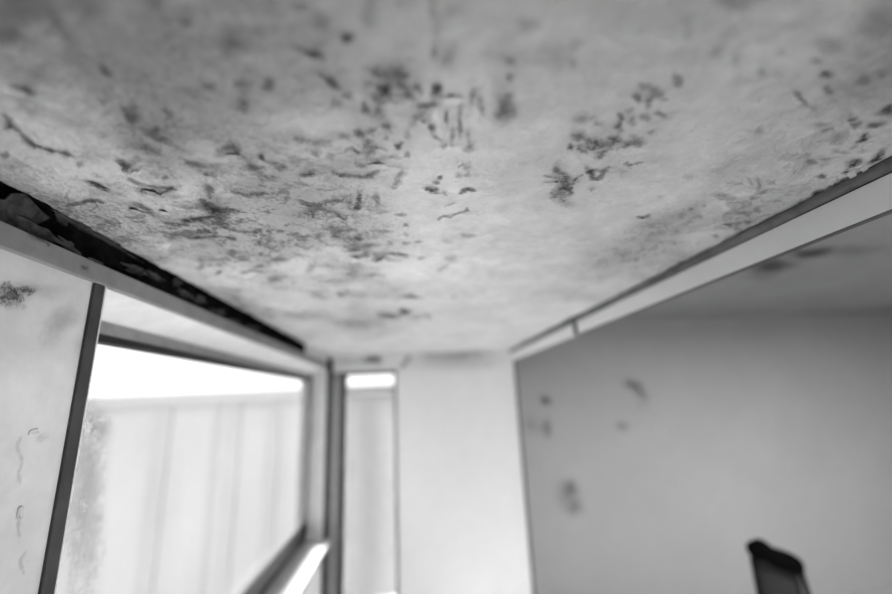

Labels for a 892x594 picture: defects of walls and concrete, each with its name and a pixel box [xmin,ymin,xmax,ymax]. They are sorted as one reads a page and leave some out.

damp [415,85,442,109]
damp [0,283,31,302]